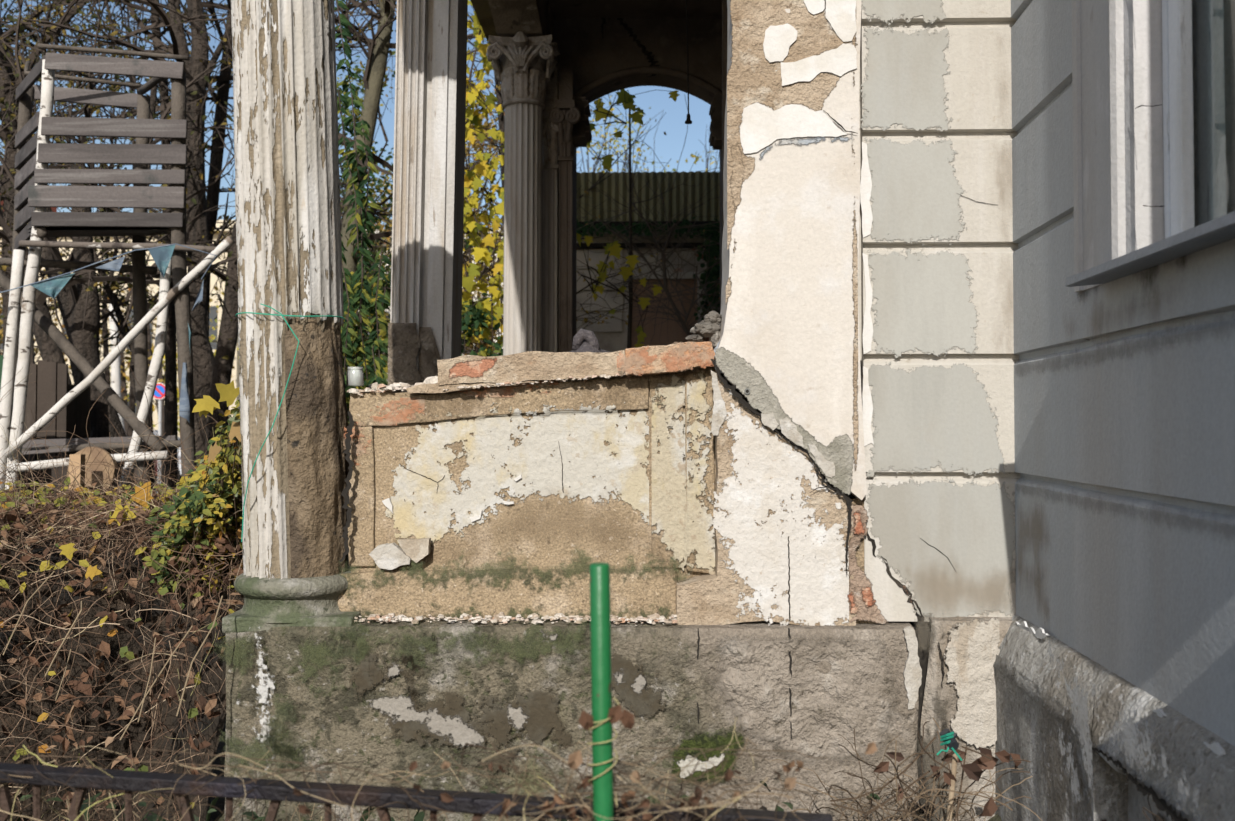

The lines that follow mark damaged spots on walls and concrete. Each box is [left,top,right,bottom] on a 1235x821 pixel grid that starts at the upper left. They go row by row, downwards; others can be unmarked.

peeling [231,0,887,626]
crack [710,359,945,814]
spalling [387,662,401,677]
spalling [613,668,646,694]
peeling [903,617,1000,755]
spalling [366,694,484,747]
spalling [507,704,529,733]